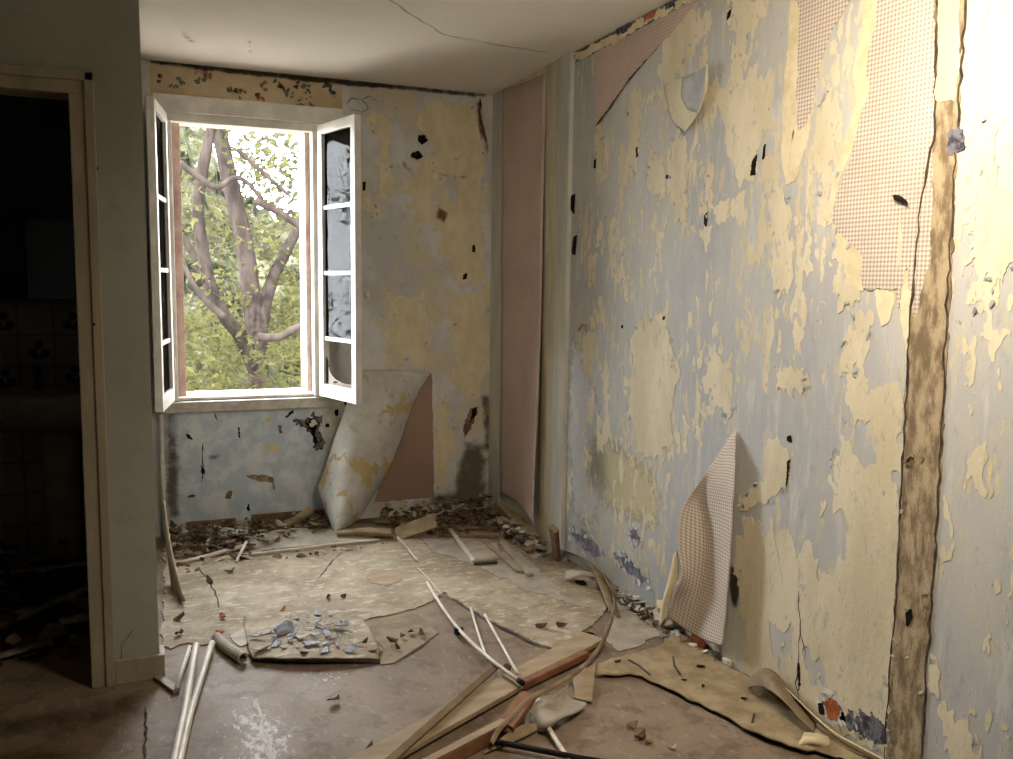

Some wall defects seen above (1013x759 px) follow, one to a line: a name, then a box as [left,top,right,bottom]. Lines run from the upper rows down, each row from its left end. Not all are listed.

crack [389,0,548,53]
peeling [364,95,491,490]
peeling [566,0,1013,759]
spalling [265,402,347,453]
peeling [246,474,275,490]